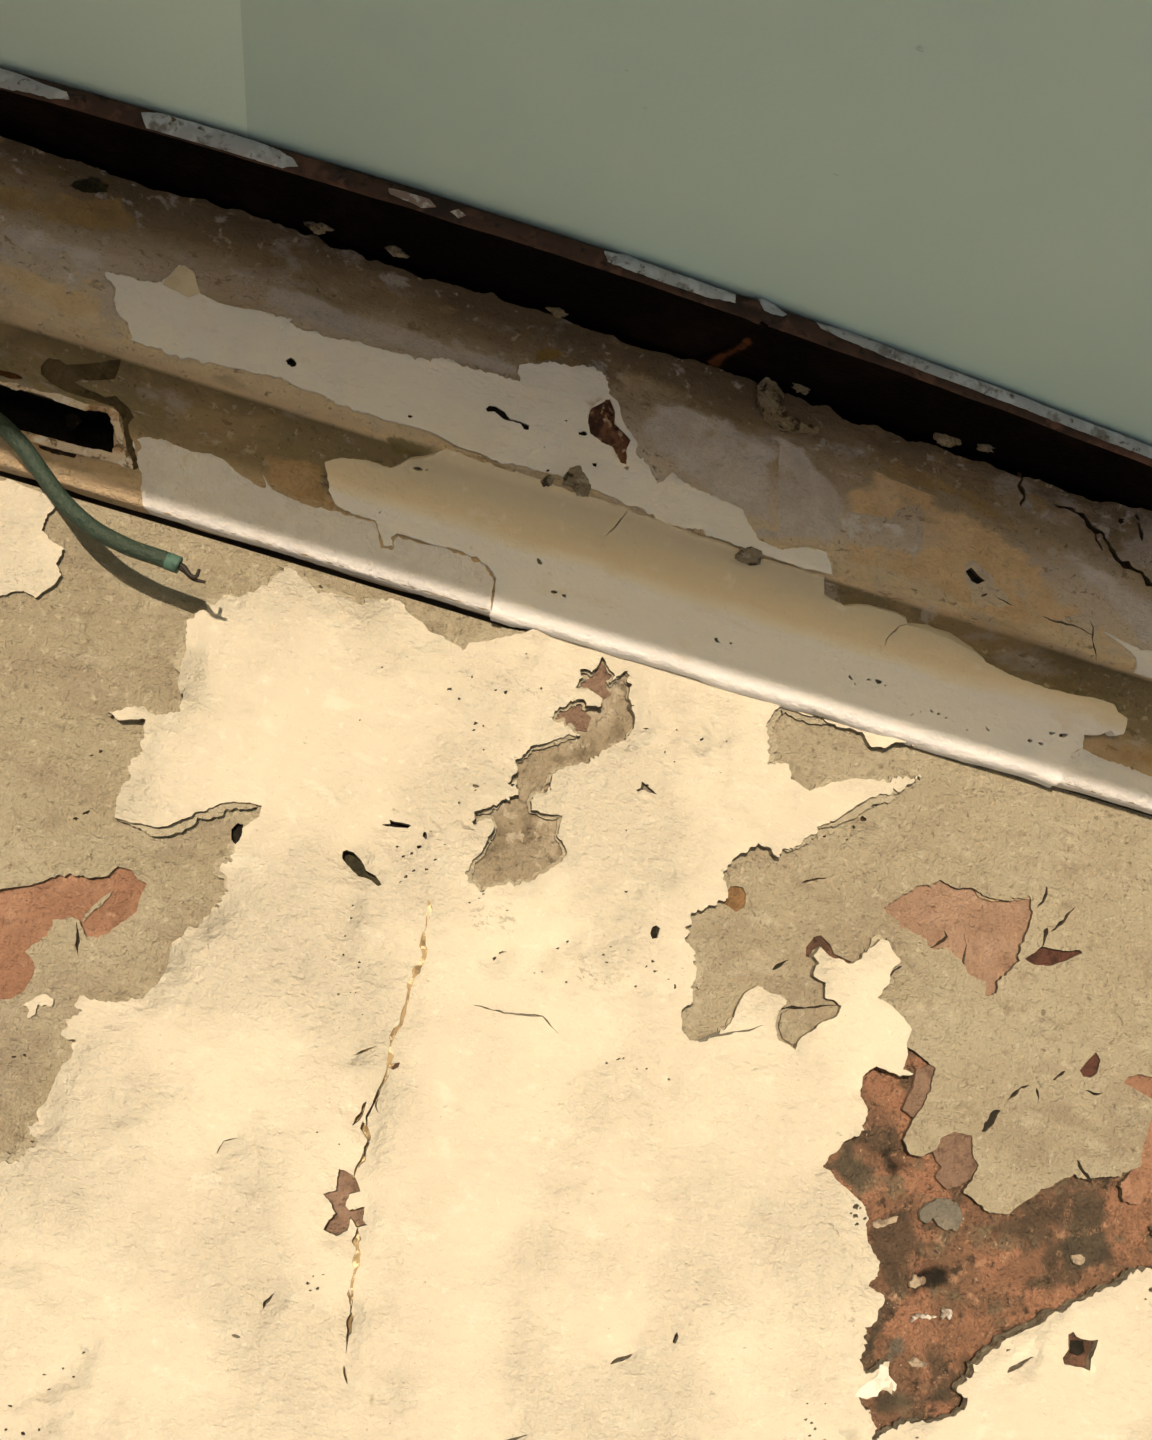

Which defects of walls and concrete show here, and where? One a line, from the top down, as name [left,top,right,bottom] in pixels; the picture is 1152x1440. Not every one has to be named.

spalling [39,358,139,470]
peeling [486,406,529,430]
rust [583,387,638,468]
crack [1017,472,1152,587]
peeling [0,449,1152,1435]
crack [351,900,432,1178]
crack [343,1222,361,1381]